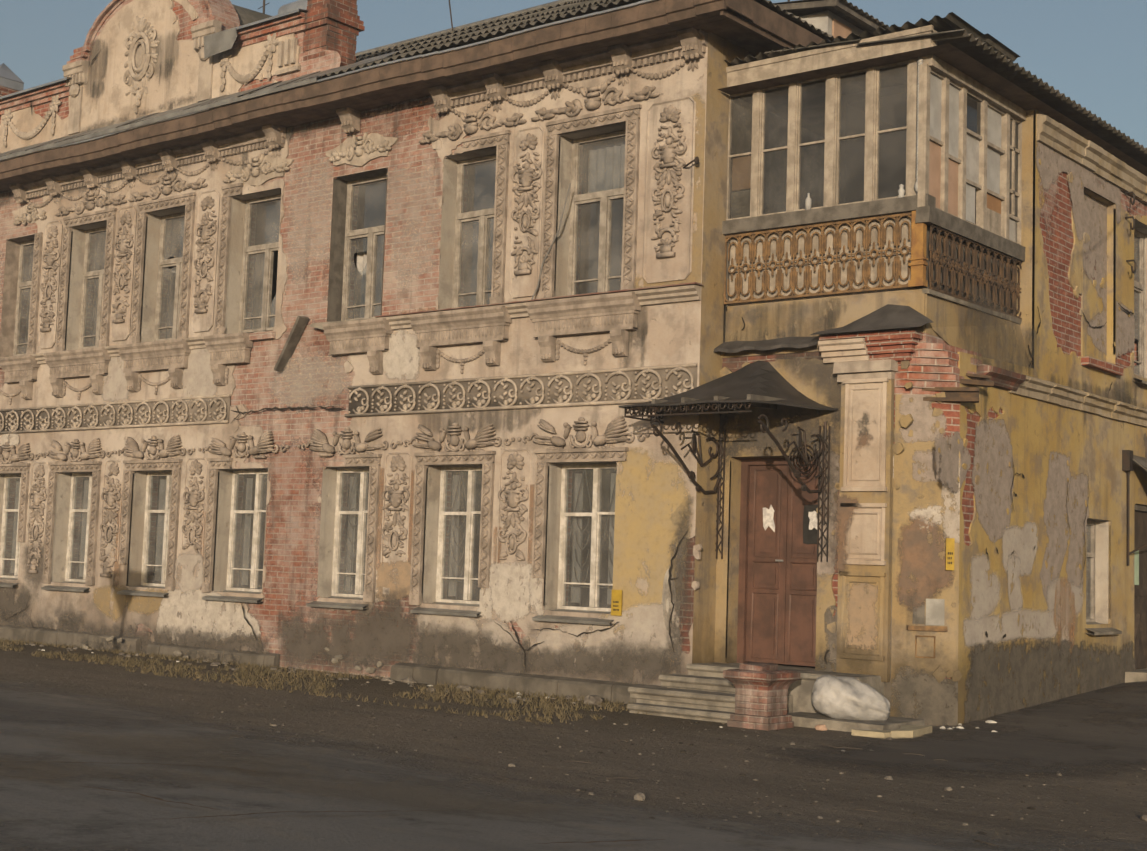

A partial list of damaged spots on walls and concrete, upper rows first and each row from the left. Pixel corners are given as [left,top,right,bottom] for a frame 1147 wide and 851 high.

flaking render [1036,141,1147,368]
peeling [892,360,1014,546]
leakage [0,547,268,654]
leakage [417,511,689,685]
crack [495,620,618,670]
crack [668,530,688,653]
leakage [897,516,953,611]
leakage [884,638,1136,726]
peeling [1040,451,1089,601]